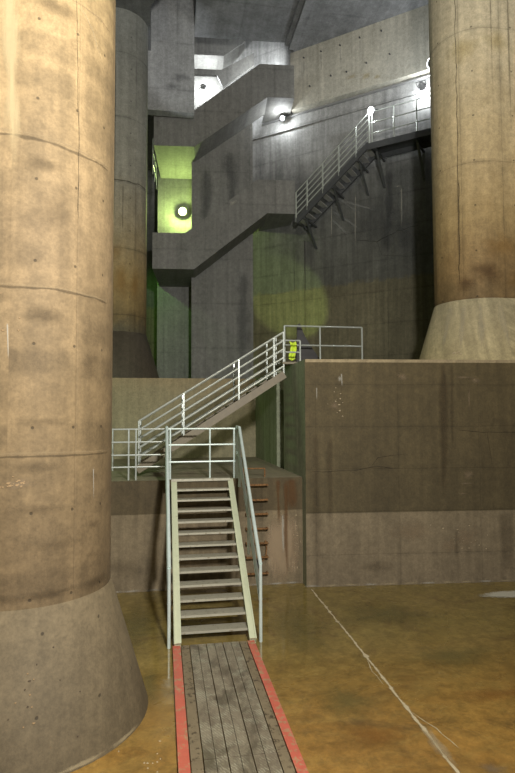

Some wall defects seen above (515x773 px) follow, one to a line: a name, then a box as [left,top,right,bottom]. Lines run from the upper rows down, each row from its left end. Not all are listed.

crack [311,589,460,773]